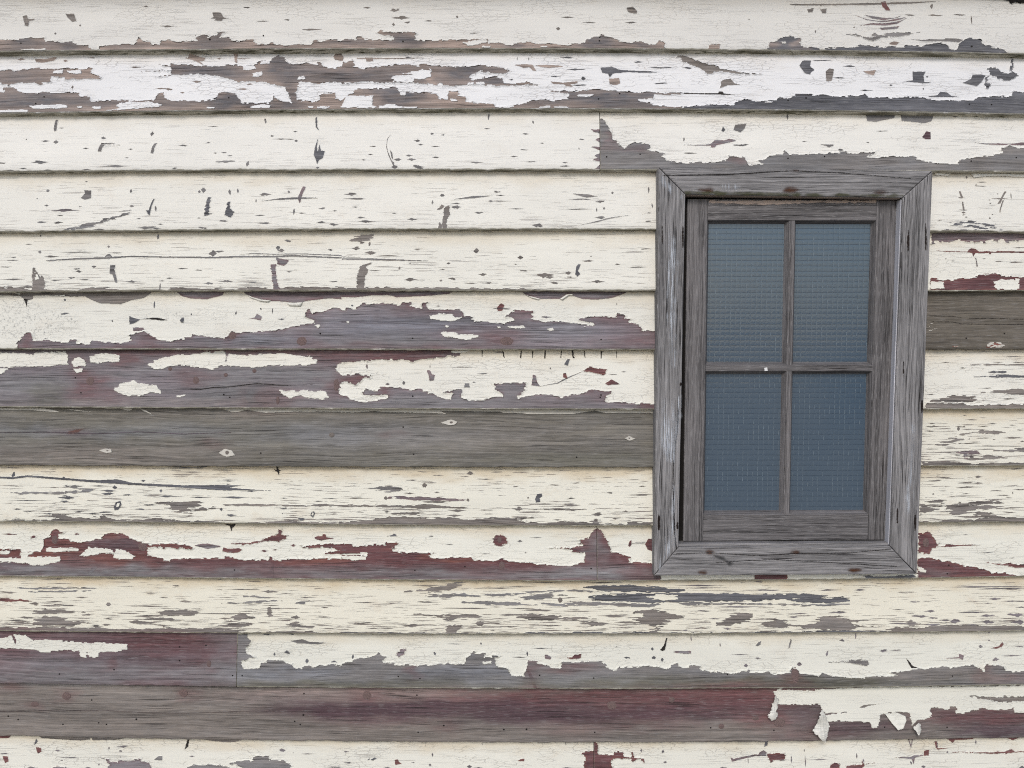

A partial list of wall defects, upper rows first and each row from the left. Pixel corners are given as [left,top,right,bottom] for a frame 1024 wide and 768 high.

peeling [0,9,1024,187]
peeling [0,188,655,415]
peeling [928,258,1024,290]
peeling [0,342,1024,688]
peeling [581,742,646,768]
peeling [910,738,977,768]